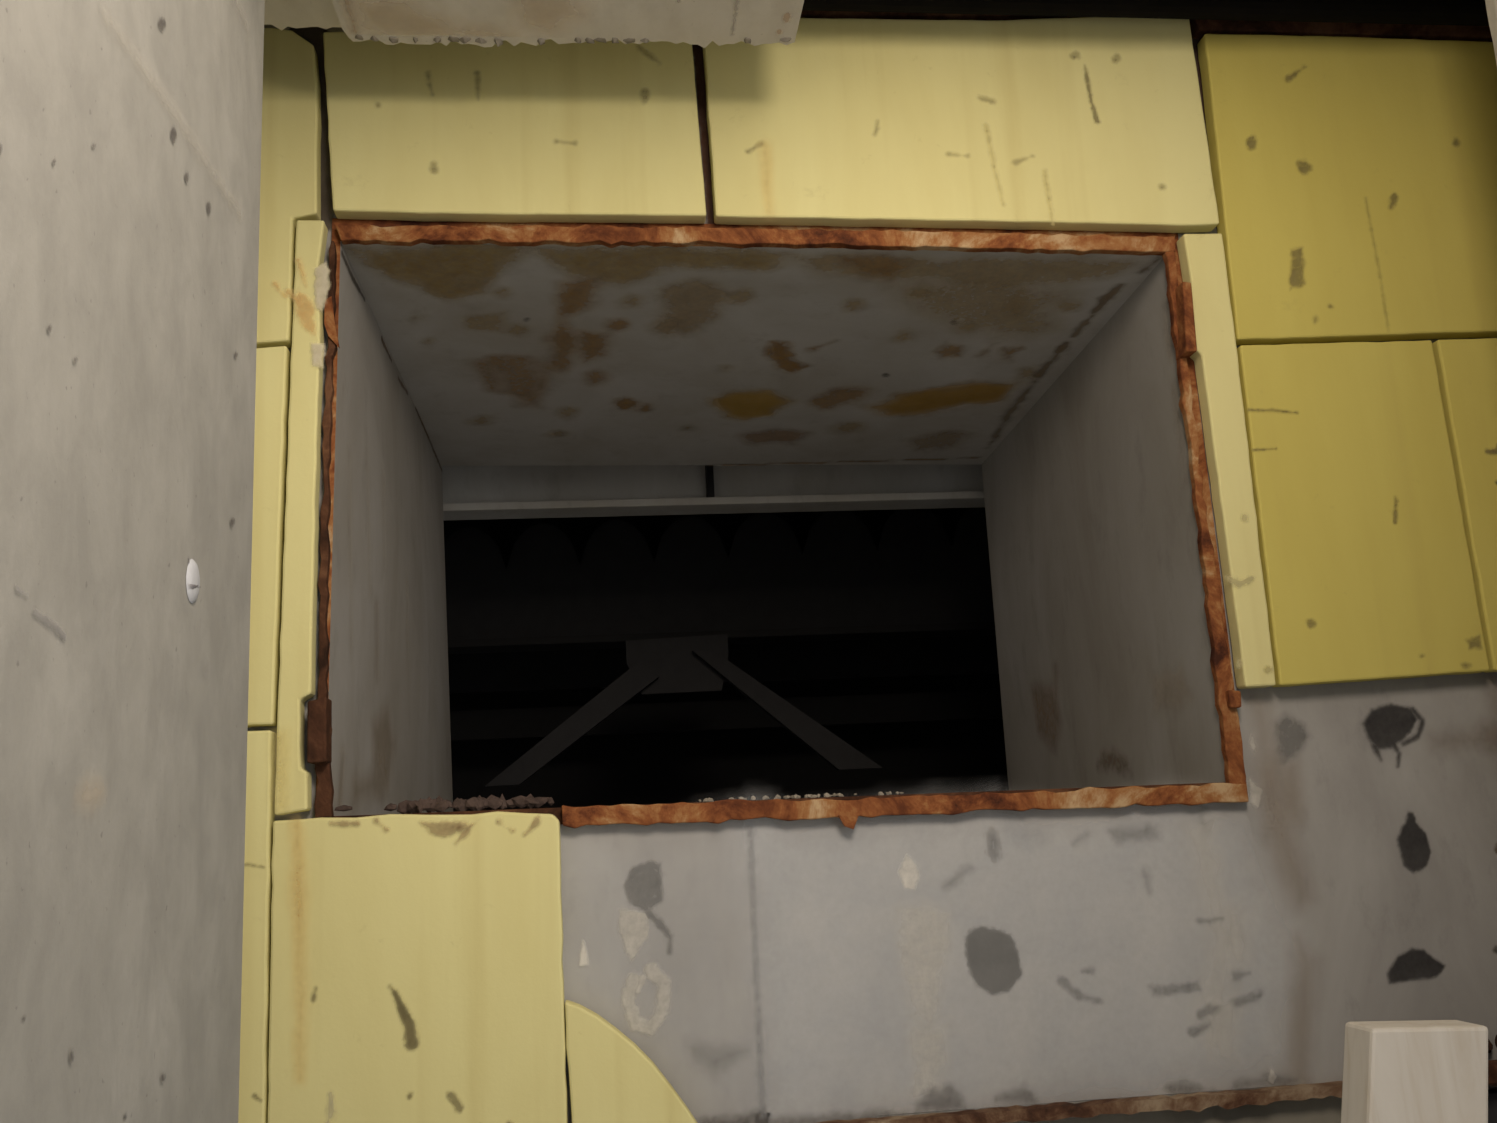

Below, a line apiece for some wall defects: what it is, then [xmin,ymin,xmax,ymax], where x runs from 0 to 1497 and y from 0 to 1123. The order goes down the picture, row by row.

rust [275,27,1249,828]